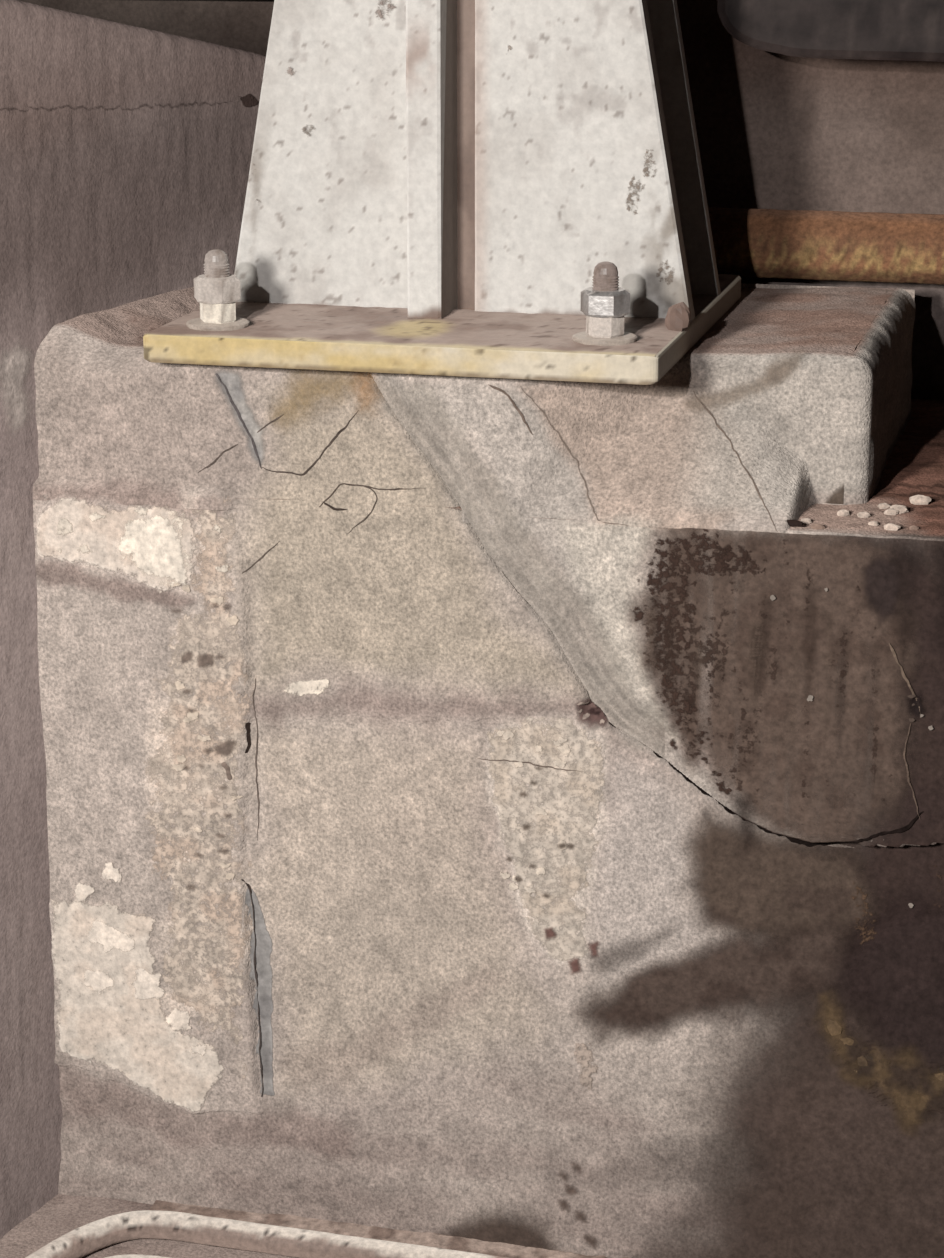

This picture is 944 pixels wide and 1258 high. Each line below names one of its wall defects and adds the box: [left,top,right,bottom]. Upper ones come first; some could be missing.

crack [199,372,358,476]
crack [319,483,415,529]
crack [488,384,645,526]
crack [693,391,778,532]
spalling [37,497,252,1112]
crack [245,678,259,834]
crack [587,691,923,847]
water stain [585,528,944,1258]